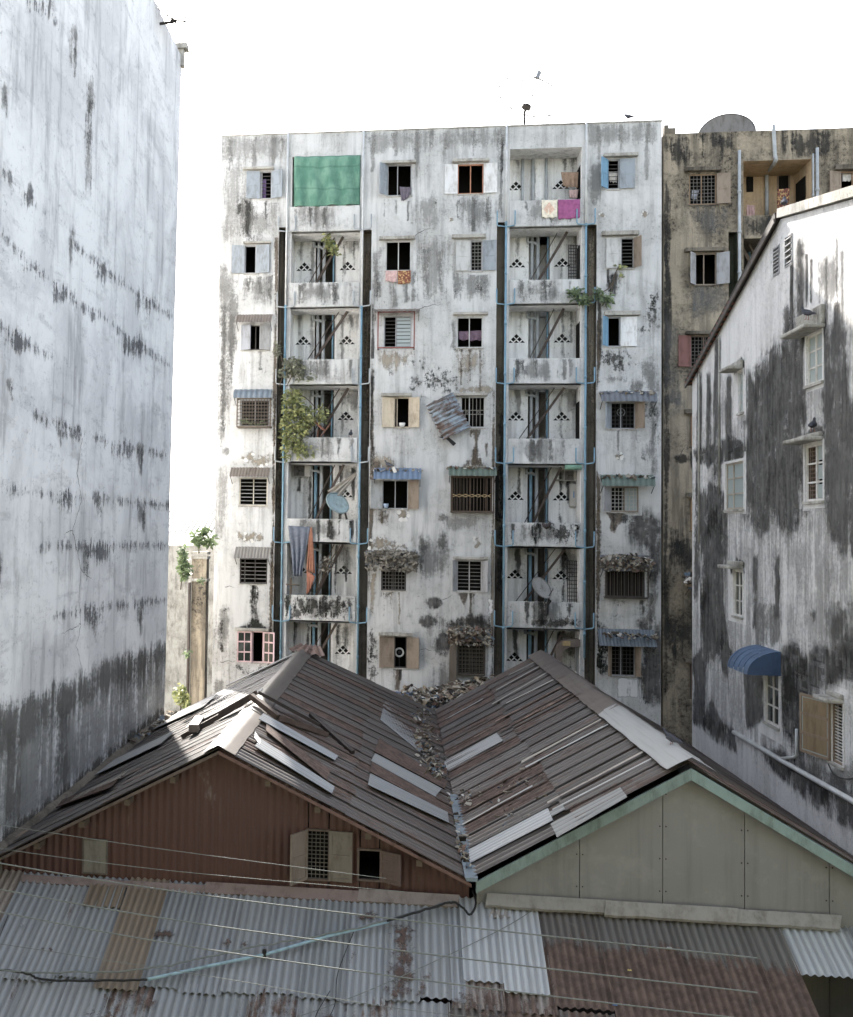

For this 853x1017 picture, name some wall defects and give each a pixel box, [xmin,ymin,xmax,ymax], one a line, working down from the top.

water stain [664,133,733,166]
water stain [250,237,286,632]
water stain [596,183,853,752]
water stain [290,476,354,648]
water stain [2,708,164,840]
rust [386,925,431,997]